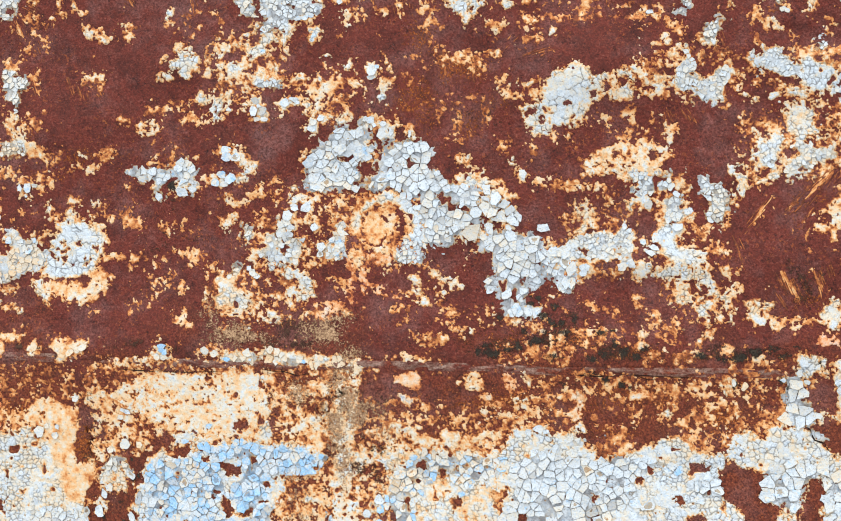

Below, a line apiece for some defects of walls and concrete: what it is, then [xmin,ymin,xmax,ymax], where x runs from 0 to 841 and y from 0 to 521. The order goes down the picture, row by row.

peeling [0,0,40,34]
peeling [0,57,127,315]
peeling [48,0,141,45]
peeling [115,114,163,137]
corrosion [208,175,284,226]
corrosion [319,0,515,163]
peeling [124,0,841,368]
corrosion [516,0,694,64]
corrosion [532,103,680,197]
corrosion [125,213,219,329]
corrosion [0,353,155,467]
peeling [0,323,841,521]